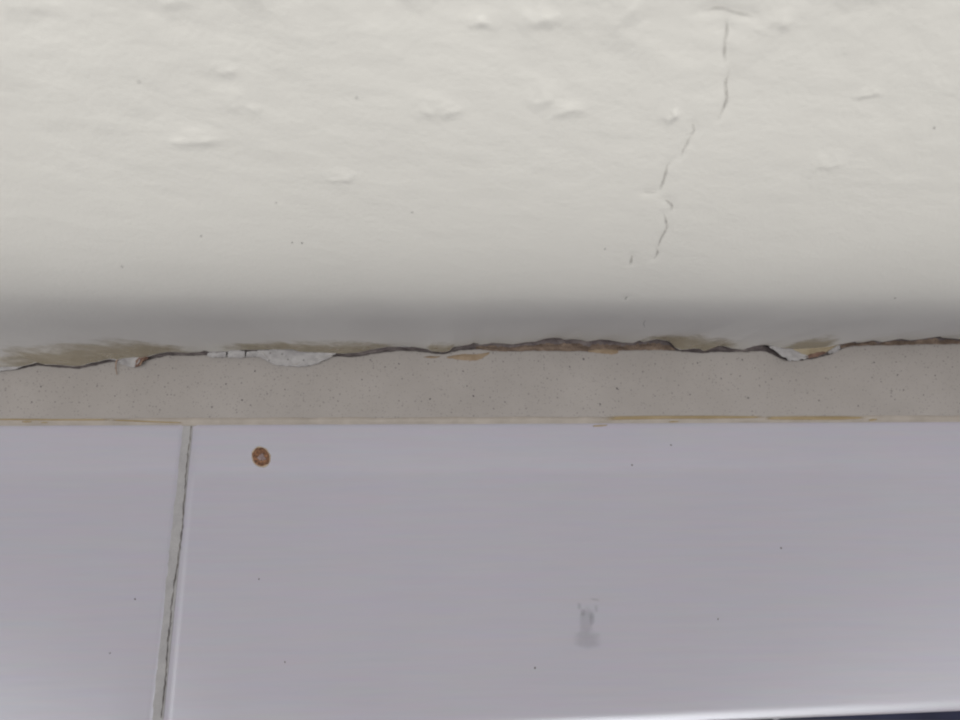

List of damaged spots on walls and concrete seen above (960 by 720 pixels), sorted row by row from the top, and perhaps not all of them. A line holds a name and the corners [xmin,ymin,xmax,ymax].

peeling [108,356,149,375]
peeling [207,350,336,367]
spalling [426,343,675,361]
peeling [769,338,960,361]
rust [252,446,271,467]